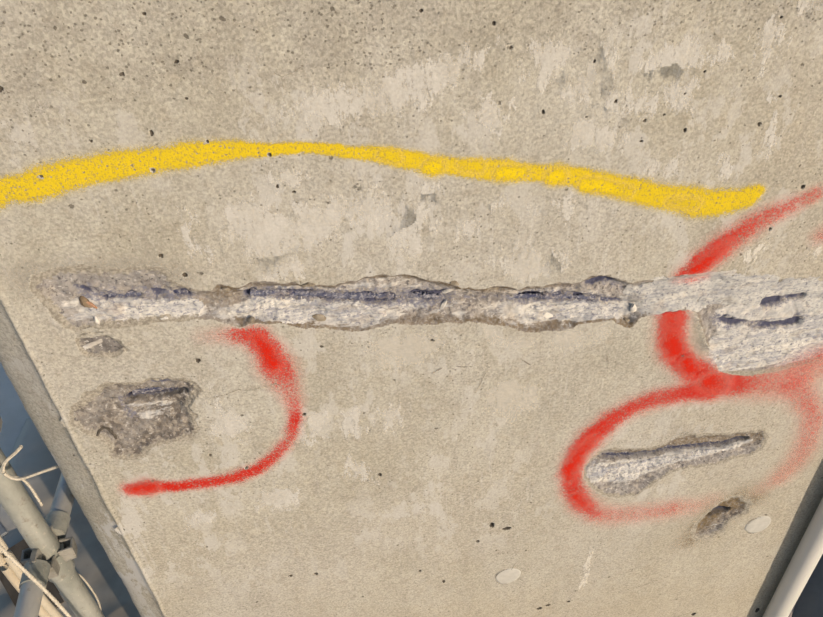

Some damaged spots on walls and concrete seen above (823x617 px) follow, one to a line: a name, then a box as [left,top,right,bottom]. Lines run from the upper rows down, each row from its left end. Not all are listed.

spalling [21,176,823,379]
spalling [61,370,252,466]
spalling [577,426,772,501]
spalling [687,493,758,543]